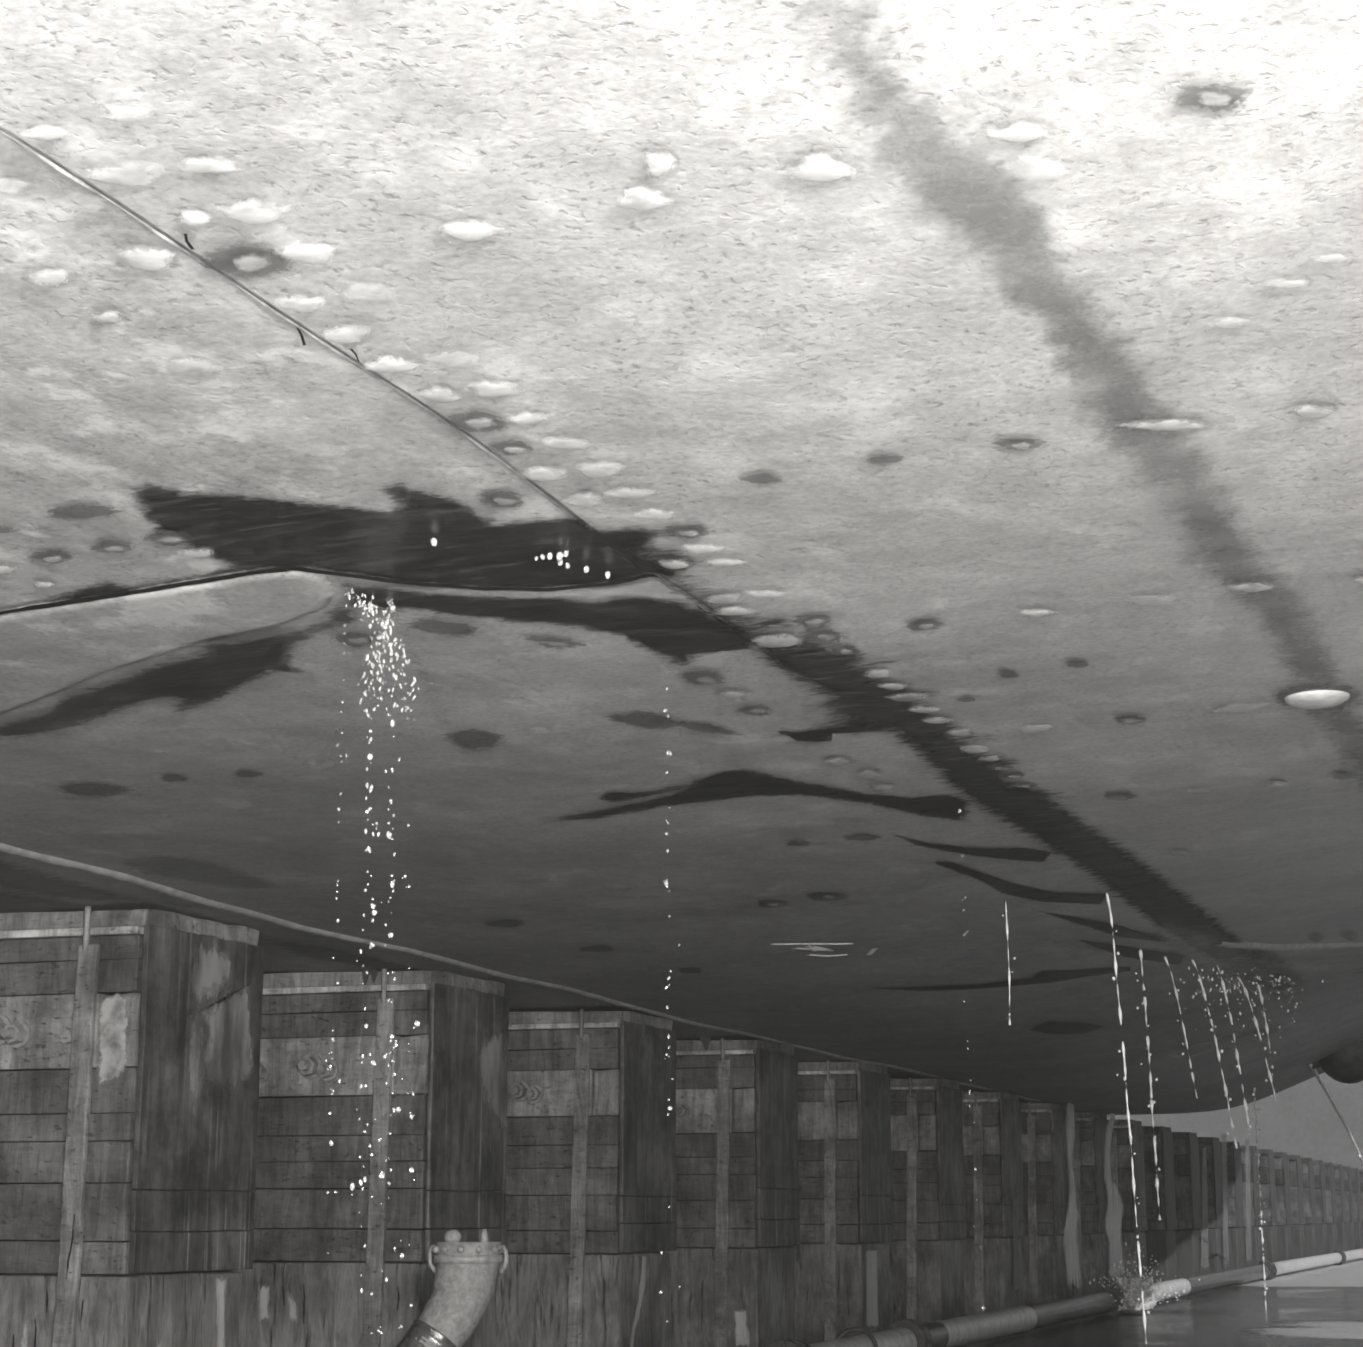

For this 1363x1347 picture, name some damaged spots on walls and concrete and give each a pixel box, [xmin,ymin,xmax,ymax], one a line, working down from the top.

crack [184,234,194,249]
crack [0,546,840,714]
leakage [0,484,1293,1347]